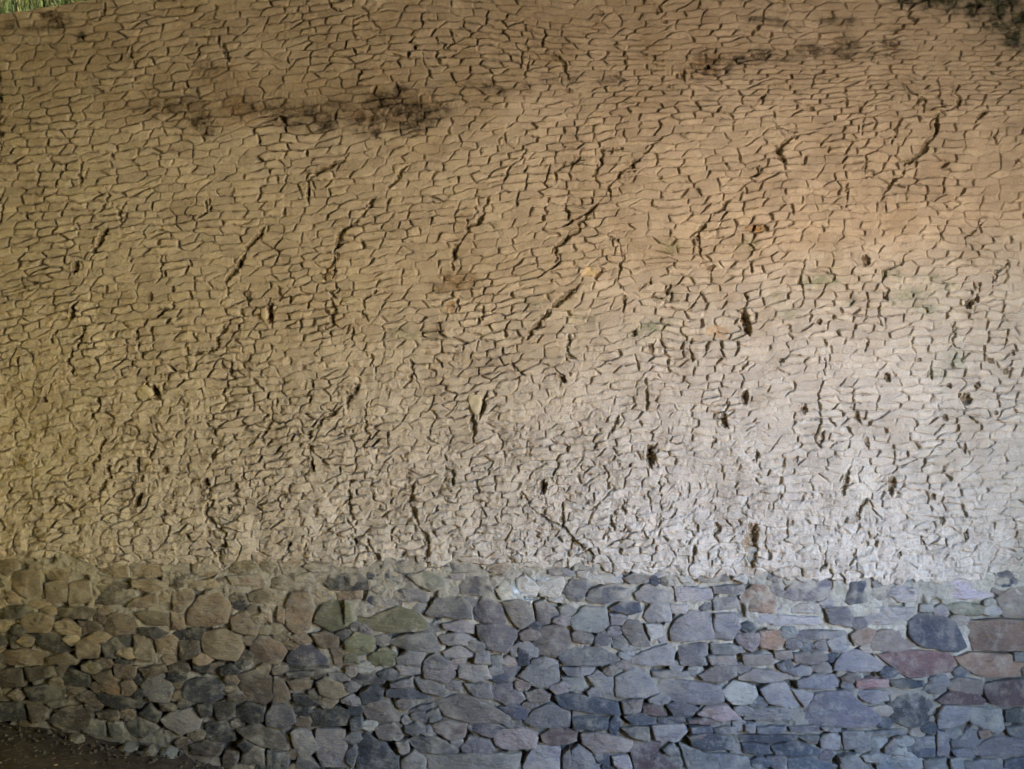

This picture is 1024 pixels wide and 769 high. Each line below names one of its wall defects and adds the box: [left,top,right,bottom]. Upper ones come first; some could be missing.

crack [195,154,349,379]
crack [299,165,409,470]
crack [450,199,489,269]
crack [553,130,653,263]
crack [527,236,701,339]
crack [697,95,799,258]
crack [864,251,911,352]
crack [881,79,998,212]
crack [92,398,113,501]
crack [407,482,430,561]
crack [522,493,590,562]
crack [819,470,877,571]